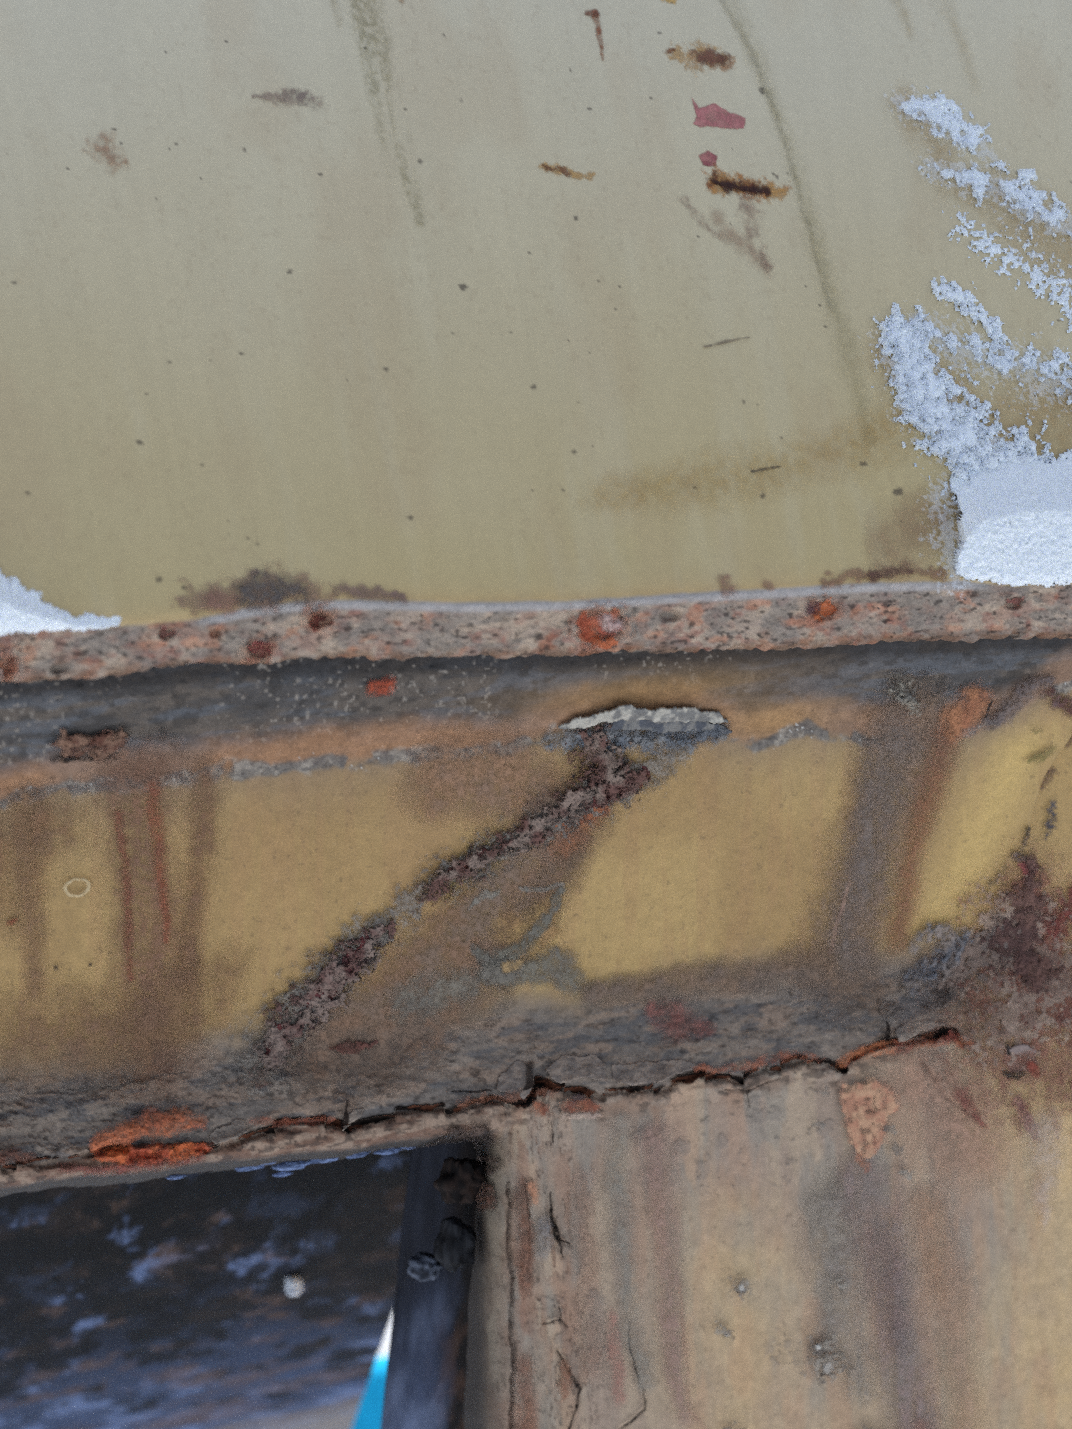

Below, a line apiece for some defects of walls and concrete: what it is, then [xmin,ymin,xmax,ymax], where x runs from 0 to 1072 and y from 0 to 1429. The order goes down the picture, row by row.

rust [667,46,734,69]
rust [707,170,788,199]
rust [175,569,406,615]
rust [822,534,947,587]
peeling [531,704,733,830]
rust [288,745,608,1089]
rust [918,854,1072,1138]
rust [60,1108,214,1174]
crack [2,1019,976,1171]
rust [820,1077,913,1180]
crack [505,1180,582,1429]
crack [620,1321,646,1429]